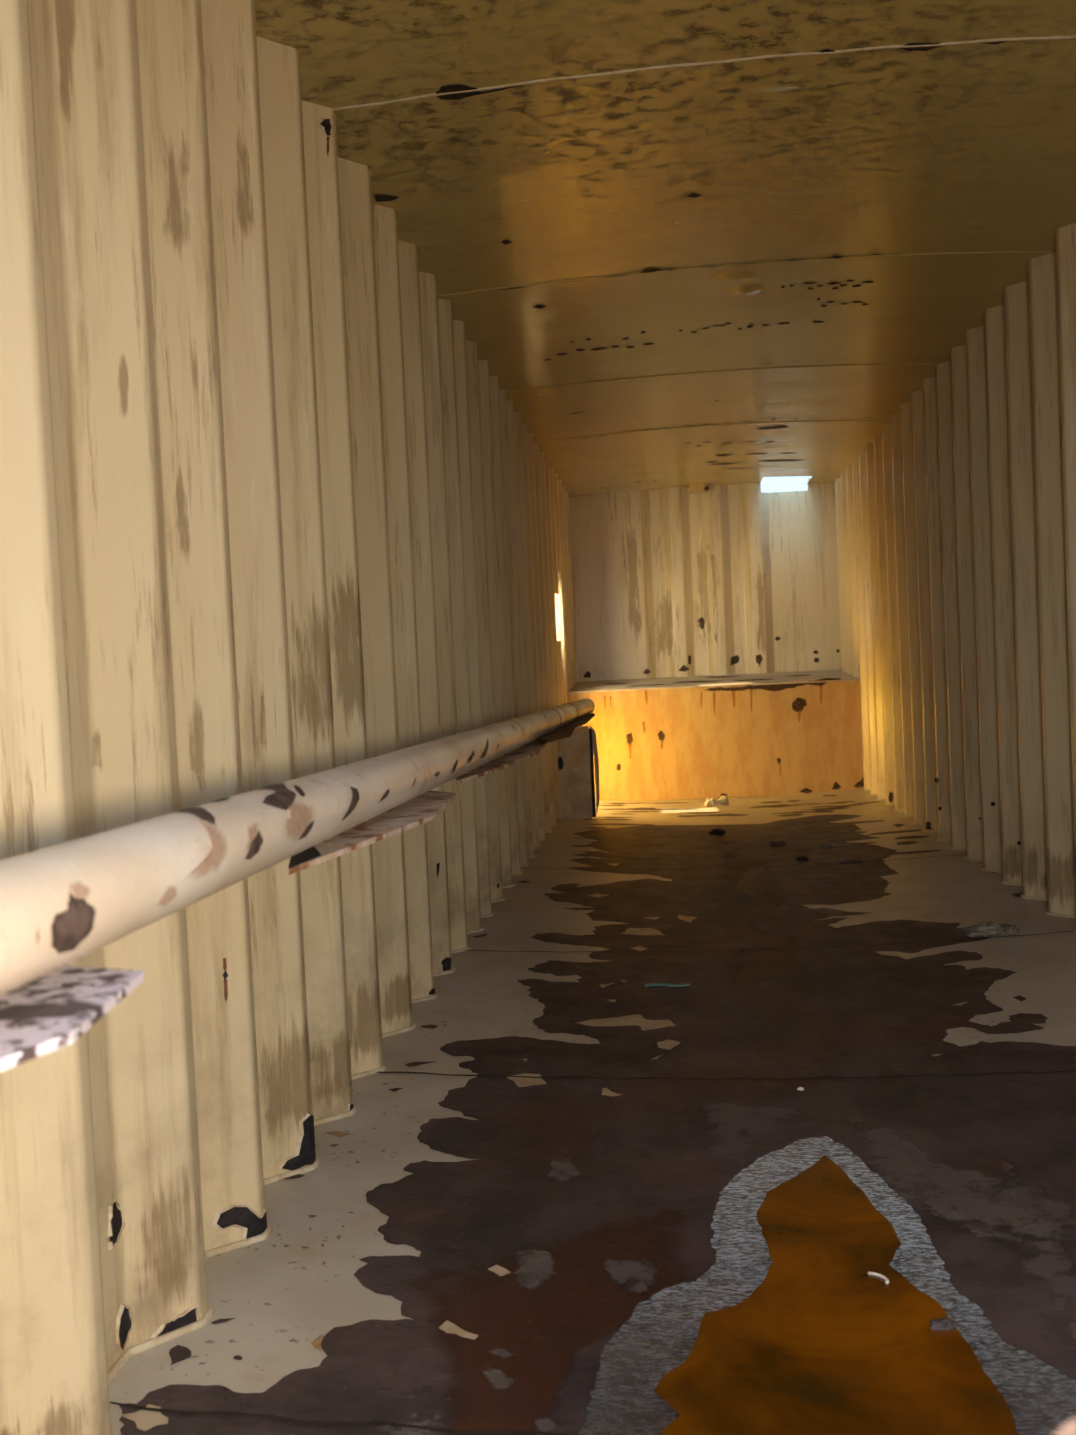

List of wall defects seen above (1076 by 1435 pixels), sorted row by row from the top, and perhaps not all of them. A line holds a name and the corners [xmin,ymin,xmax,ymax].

peeling [261,783,305,810]
peeling [51,892,96,953]
peeling [119,795,1076,1435]